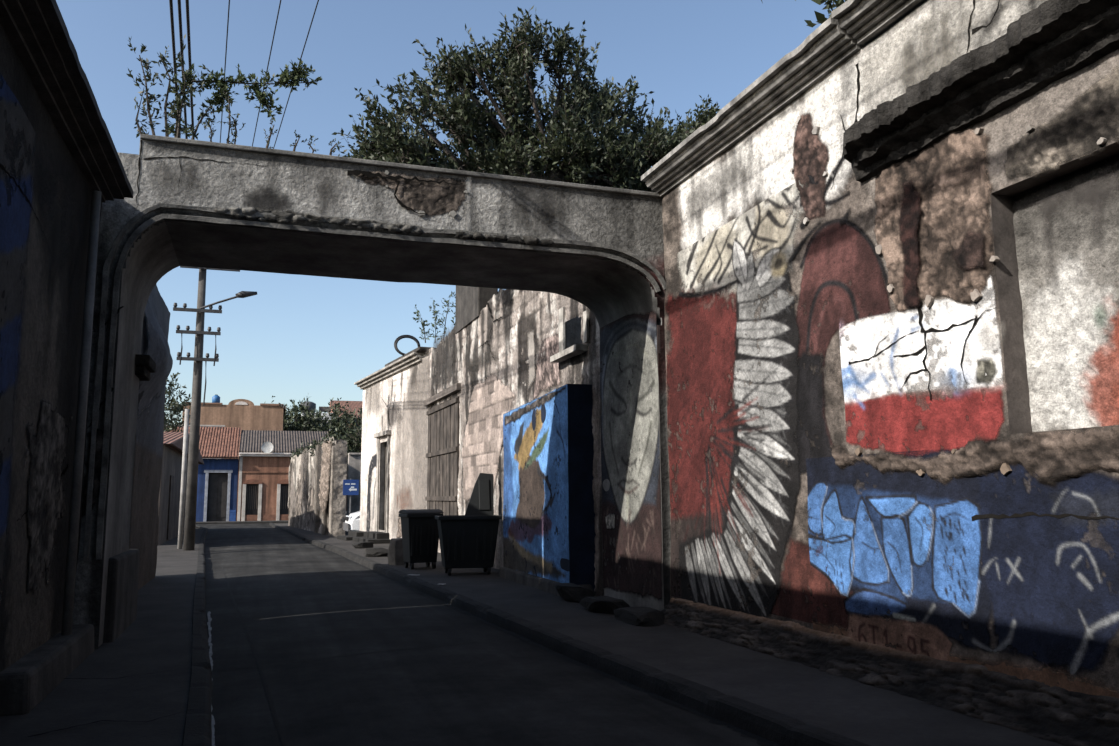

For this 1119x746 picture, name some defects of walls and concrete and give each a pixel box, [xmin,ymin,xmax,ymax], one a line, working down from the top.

spalling [1004,67,1119,180]
spalling [202,170,468,234]
spalling [455,231,554,245]
spalling [873,127,1000,311]
crack [848,302,997,400]
spalling [462,333,566,501]
spalling [830,425,1119,486]